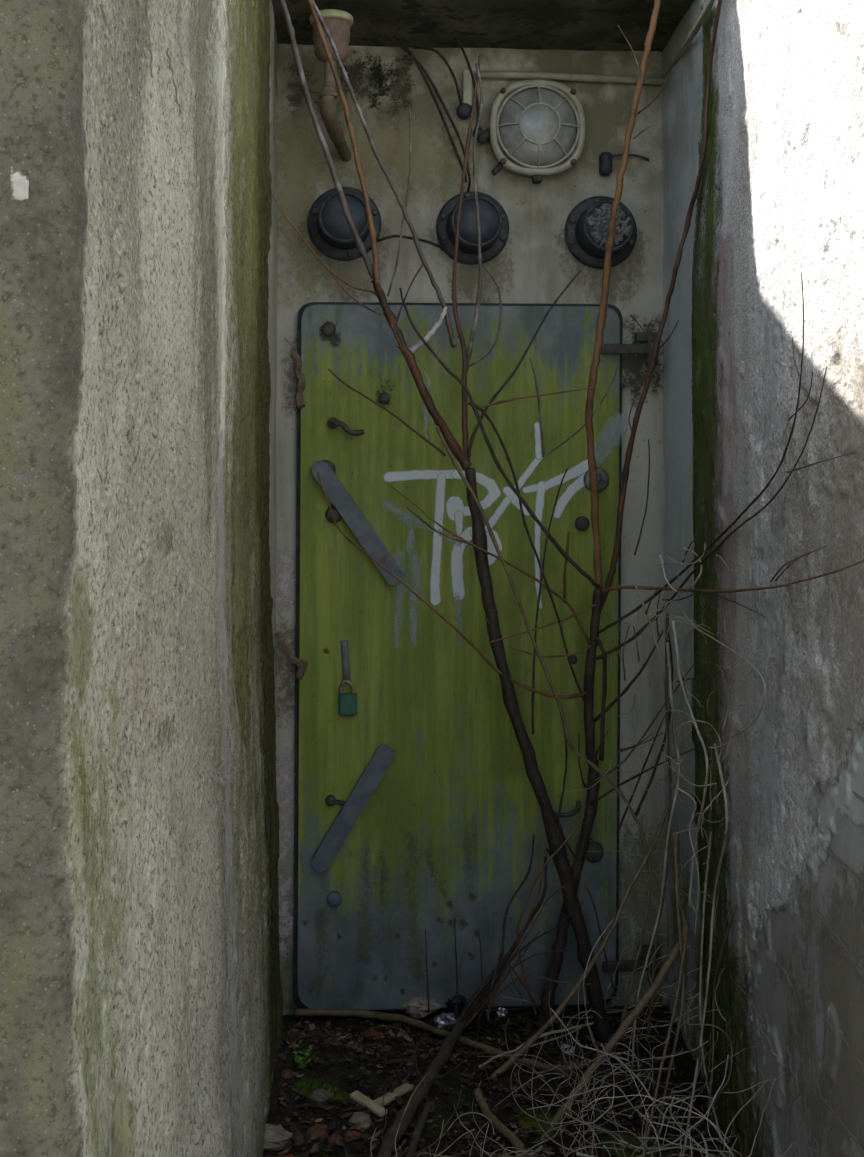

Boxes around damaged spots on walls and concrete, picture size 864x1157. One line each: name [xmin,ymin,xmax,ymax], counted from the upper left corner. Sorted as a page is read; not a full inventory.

crack [99,4,107,26]
crack [145,0,182,114]
damp [277,65,323,294]
damp [336,51,480,202]
peeling [728,723,864,1157]